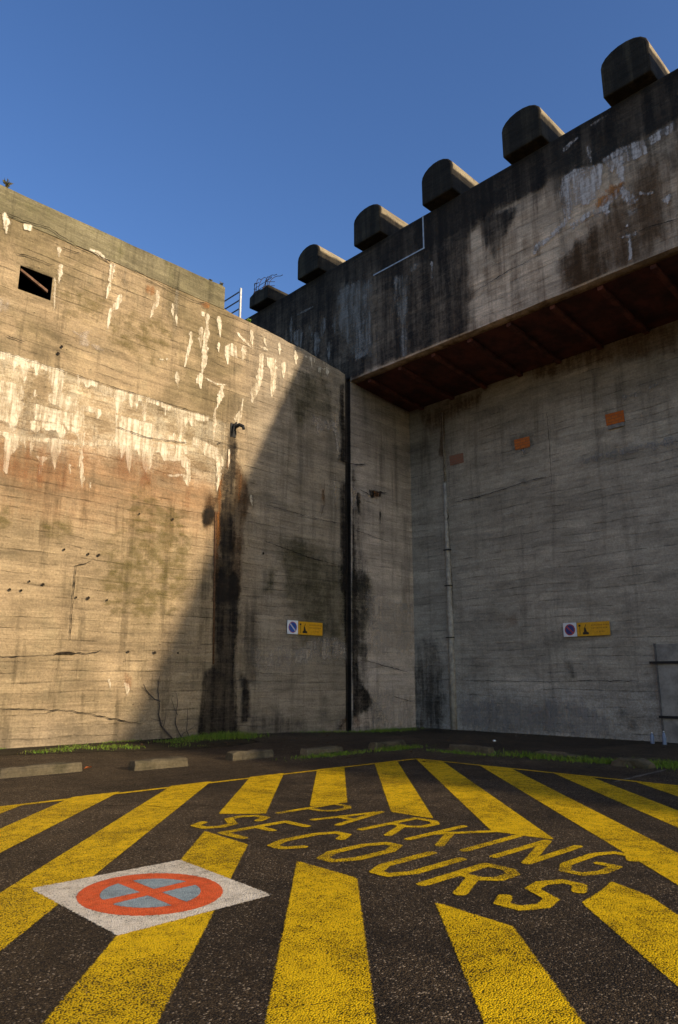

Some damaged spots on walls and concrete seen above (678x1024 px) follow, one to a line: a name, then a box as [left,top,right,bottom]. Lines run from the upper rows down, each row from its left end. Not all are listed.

damp [0,69,678,735]
spalling [352,488,382,513]
crack [0,561,100,657]
crack [0,708,139,724]